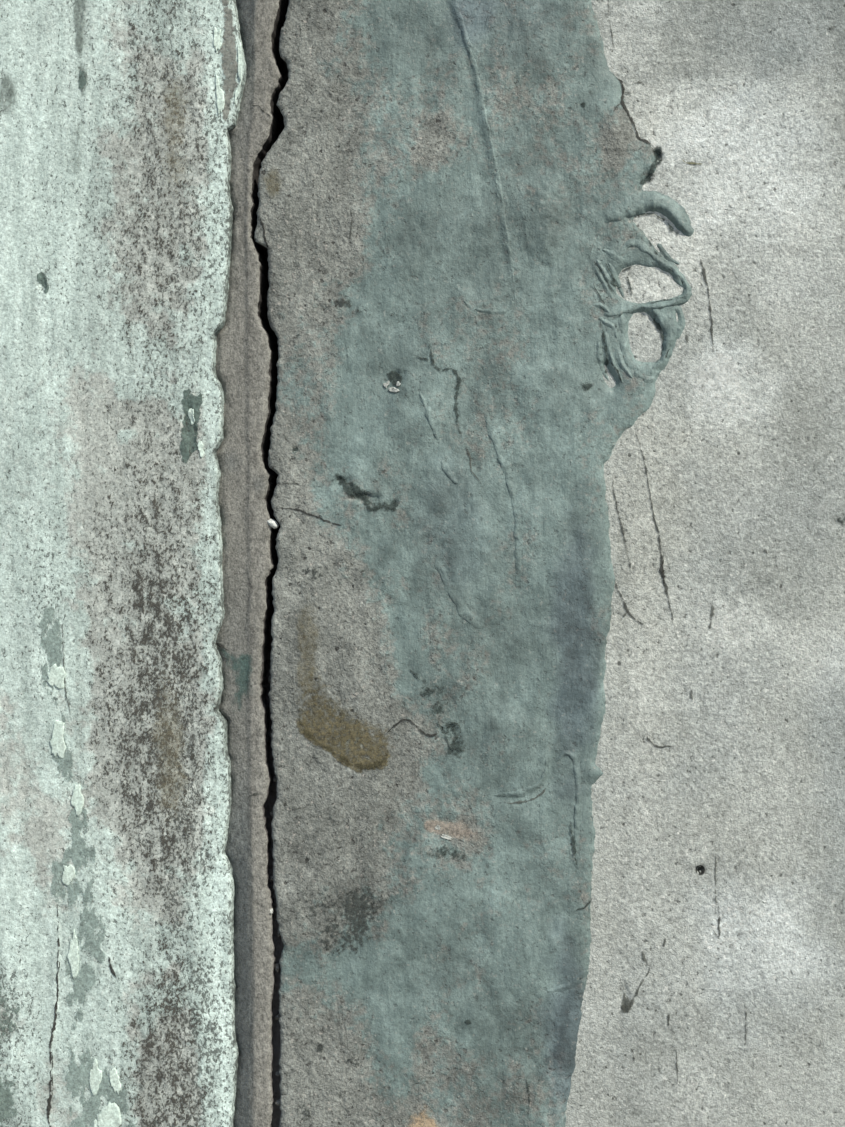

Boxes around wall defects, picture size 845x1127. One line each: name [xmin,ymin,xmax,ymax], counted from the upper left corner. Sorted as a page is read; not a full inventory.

spalling [640,146,662,184]
spalling [383,371,402,392]
spalling [335,474,398,511]
crack [250,0,345,1127]
water stain [297,674,390,773]
spalling [409,669,464,756]
spalling [425,820,471,860]
crack [47,879,60,1127]